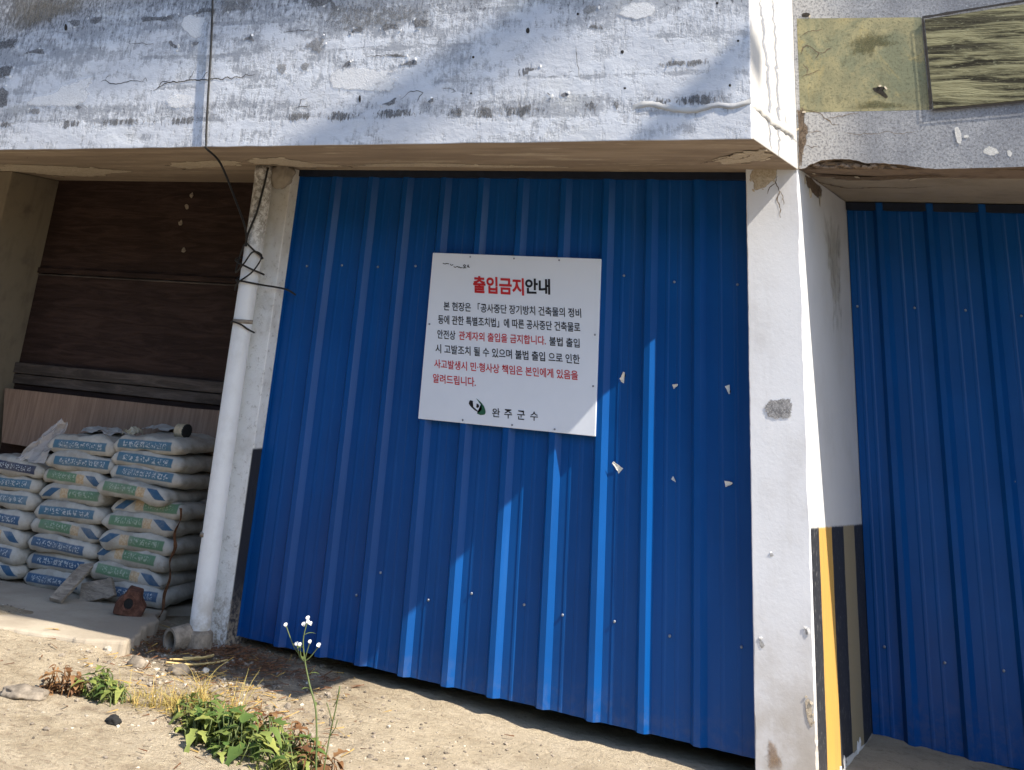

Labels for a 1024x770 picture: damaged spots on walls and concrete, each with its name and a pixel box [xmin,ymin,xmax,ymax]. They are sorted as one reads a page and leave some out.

crack [103,71,252,90]
crack [706,0,915,163]
peeling [712,149,777,192]
spalling [797,108,945,198]
crack [767,177,784,218]